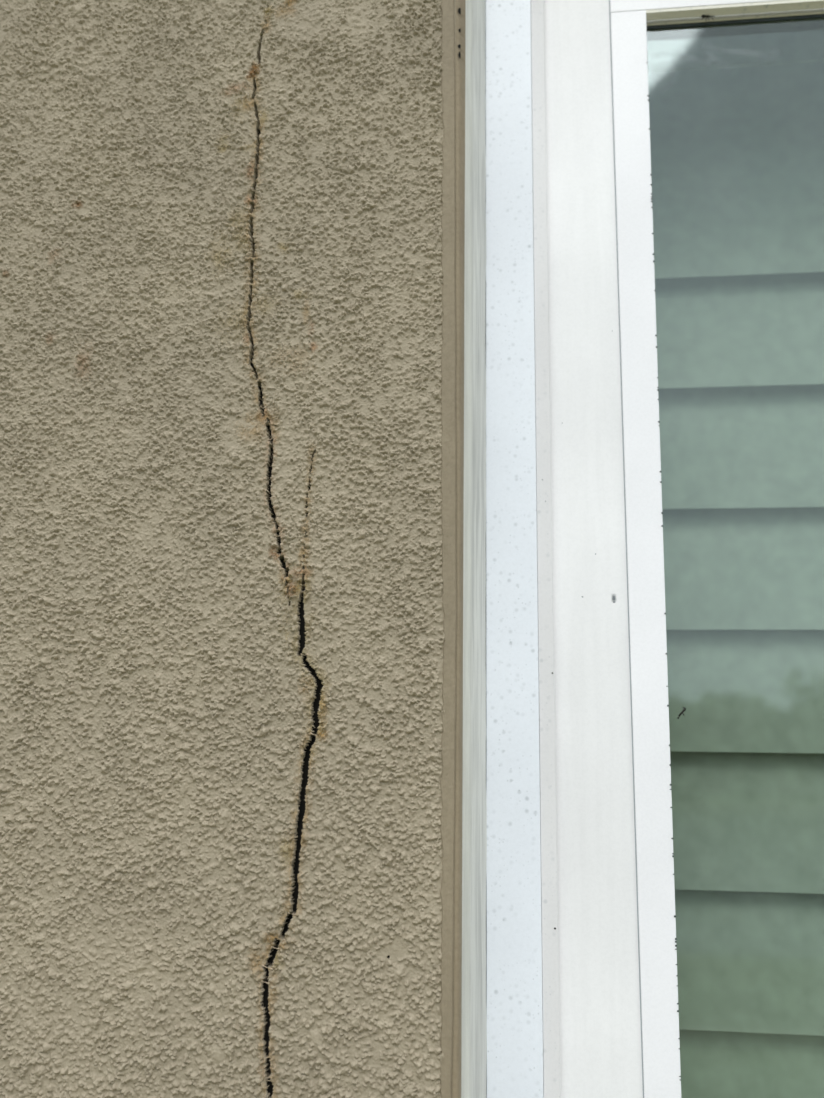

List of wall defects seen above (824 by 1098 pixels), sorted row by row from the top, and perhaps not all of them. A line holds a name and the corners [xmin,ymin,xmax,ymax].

crack [248,47,323,1096]